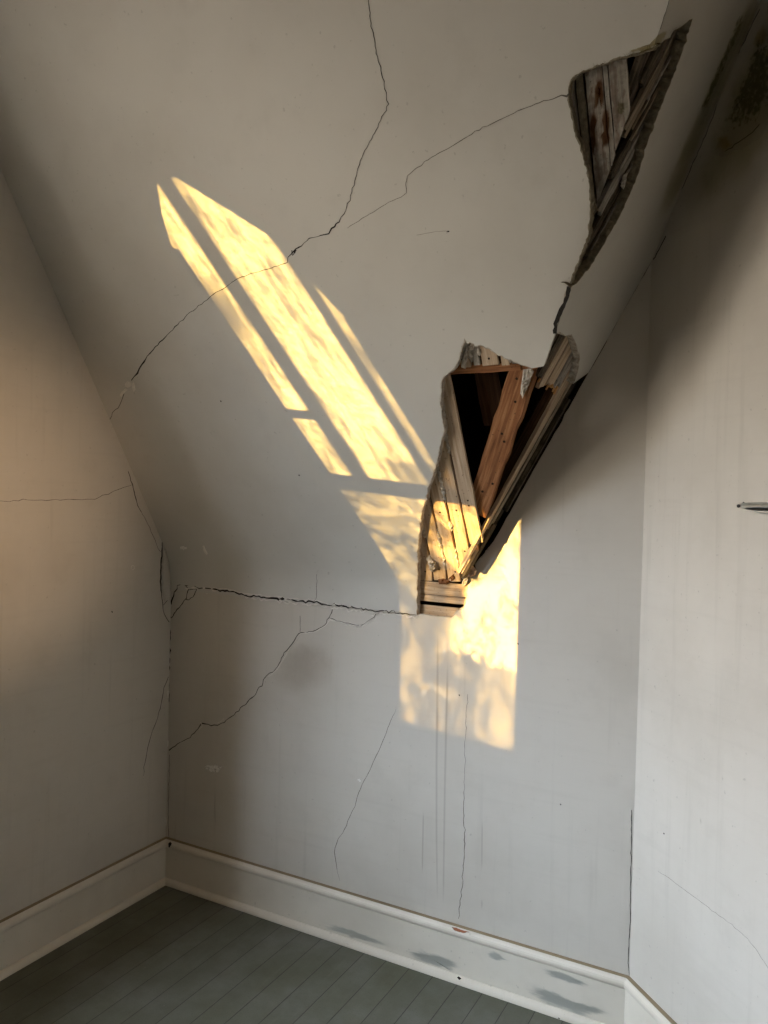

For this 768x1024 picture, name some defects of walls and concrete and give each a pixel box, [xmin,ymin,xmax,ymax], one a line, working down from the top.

crack [110,0,571,419]
flaking render [561,19,692,288]
crack [4,472,417,836]
flaking render [416,332,580,617]